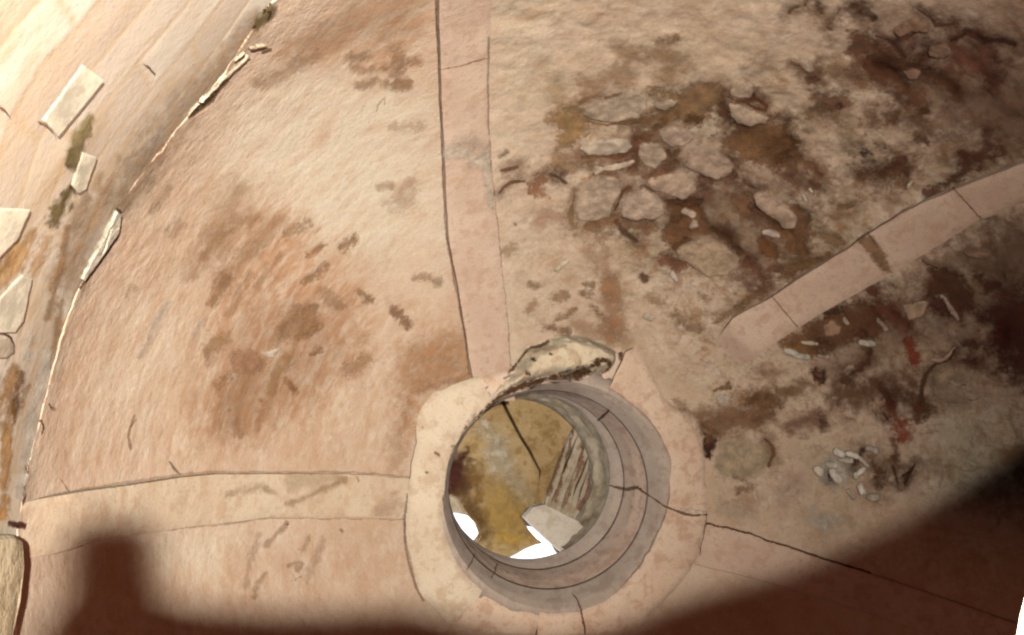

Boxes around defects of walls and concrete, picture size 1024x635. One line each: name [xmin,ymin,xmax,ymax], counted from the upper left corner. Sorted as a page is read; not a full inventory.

flaking render [844,29,962,101]
flaking render [526,82,851,311]
flaking render [843,125,913,189]
flaking render [79,208,122,289]
flaking render [779,259,974,419]
flaking render [700,422,721,459]
crack [609,485,871,574]